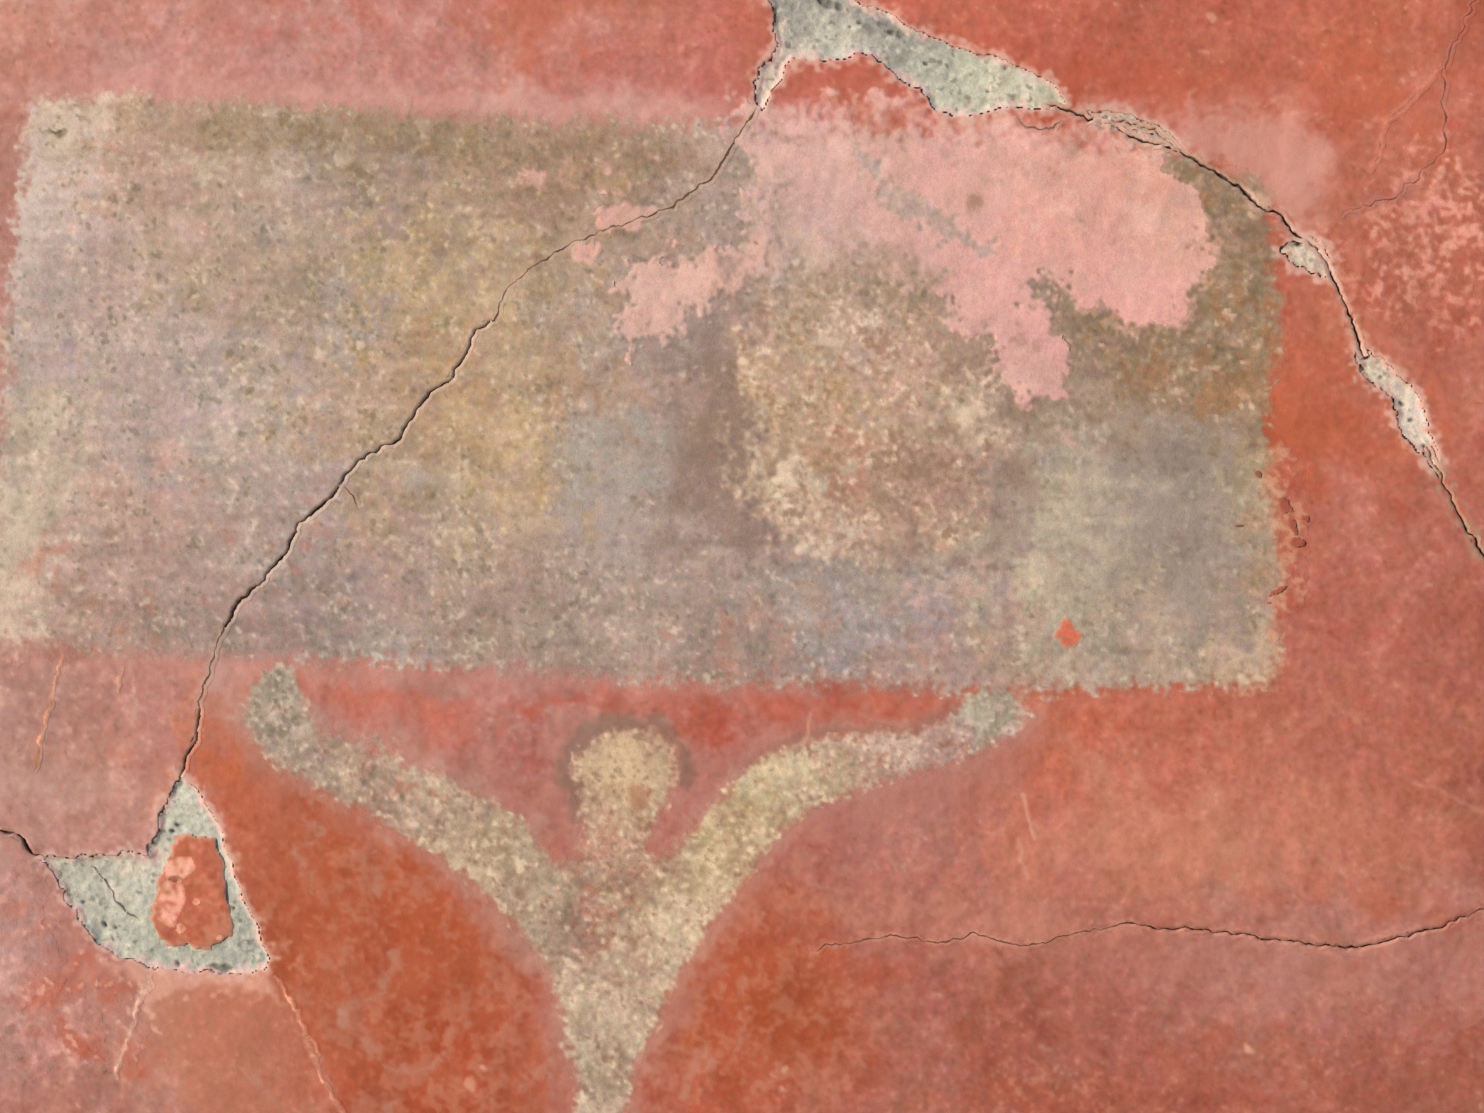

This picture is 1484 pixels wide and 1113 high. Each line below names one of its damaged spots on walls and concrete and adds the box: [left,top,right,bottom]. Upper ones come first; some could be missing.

flaking render [612,0,1216,416]
crack [1045,0,1481,359]
peeling [1281,120,1484,355]
crack [177,104,761,778]
spalling [1356,351,1439,465]
crack [1424,445,1484,563]
crack [30,654,64,773]
crack [112,665,125,693]
crack [0,825,46,860]
spalling [40,777,269,974]
crack [810,904,1484,955]